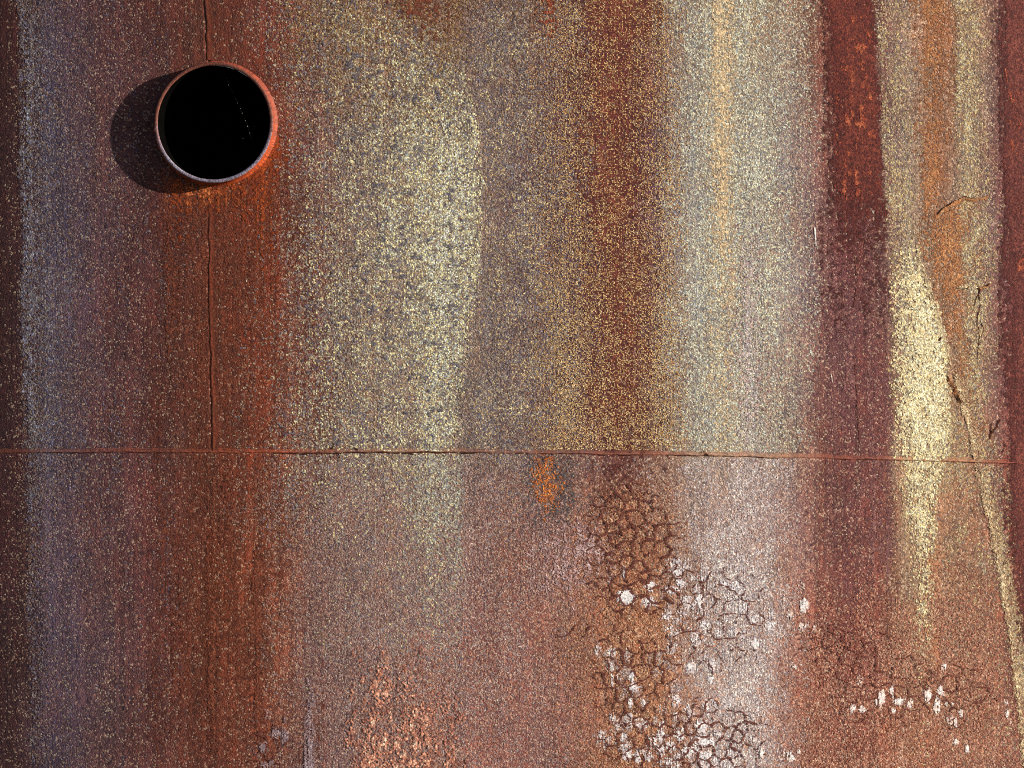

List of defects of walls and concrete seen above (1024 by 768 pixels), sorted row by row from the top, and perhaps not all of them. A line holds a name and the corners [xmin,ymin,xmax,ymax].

rust [145,101,336,768]
rust [343,647,472,768]
rust [522,0,707,768]
crack [552,483,777,768]
damp [634,0,829,768]
crack [798,621,998,732]
rust [778,0,1024,768]
damp [874,0,1024,768]